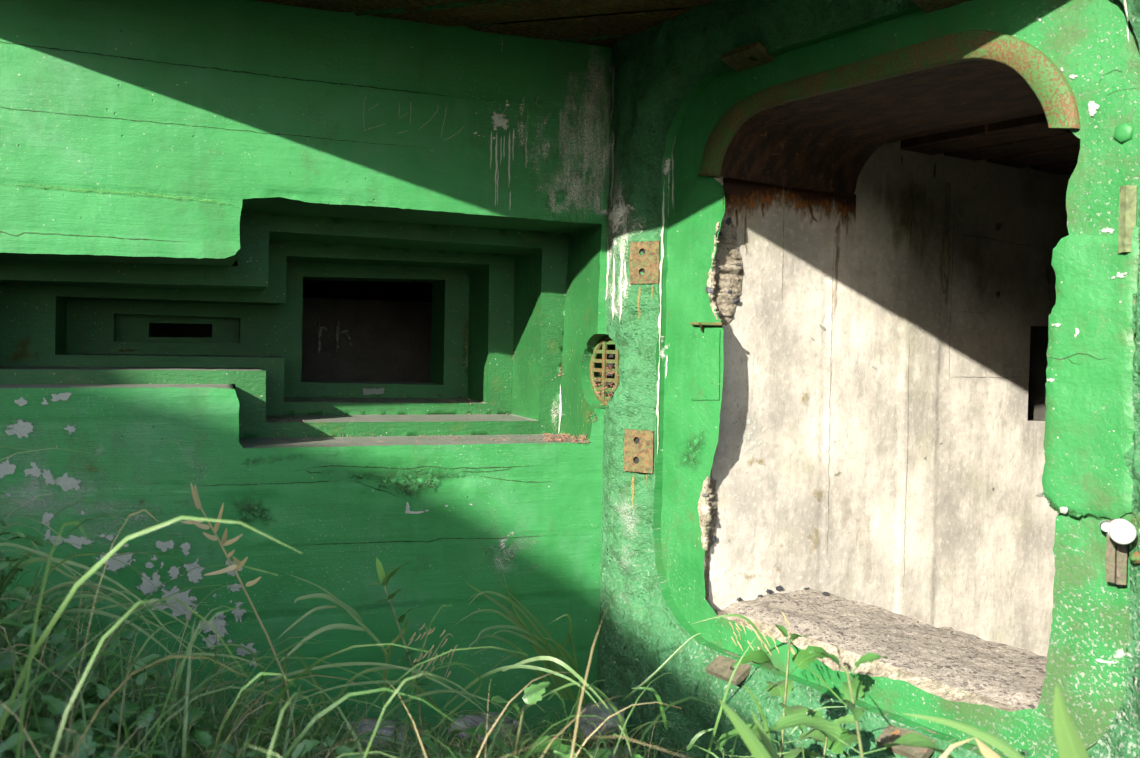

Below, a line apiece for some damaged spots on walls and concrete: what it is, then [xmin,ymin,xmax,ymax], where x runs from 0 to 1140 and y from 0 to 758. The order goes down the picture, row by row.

damp [517,61,643,323]
spalling [705,217,743,326]
corrosion [722,177,856,231]
peeling [5,392,71,438]
peeling [0,456,260,667]
spalling [681,435,1021,712]